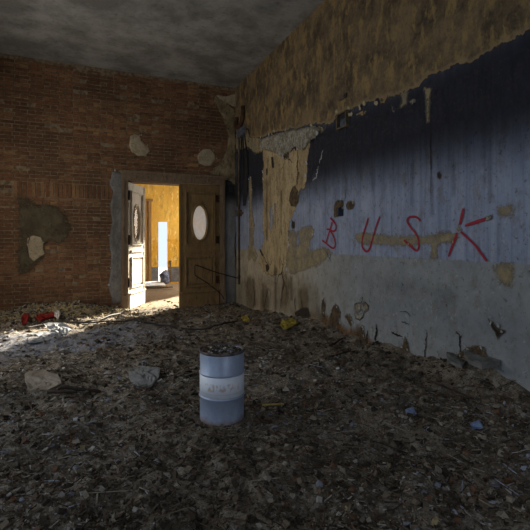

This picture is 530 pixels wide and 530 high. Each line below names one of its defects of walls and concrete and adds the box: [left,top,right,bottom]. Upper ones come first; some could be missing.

peeling [235,0,530,277]
flaking render [321,297,369,343]
flaking render [488,315,506,339]